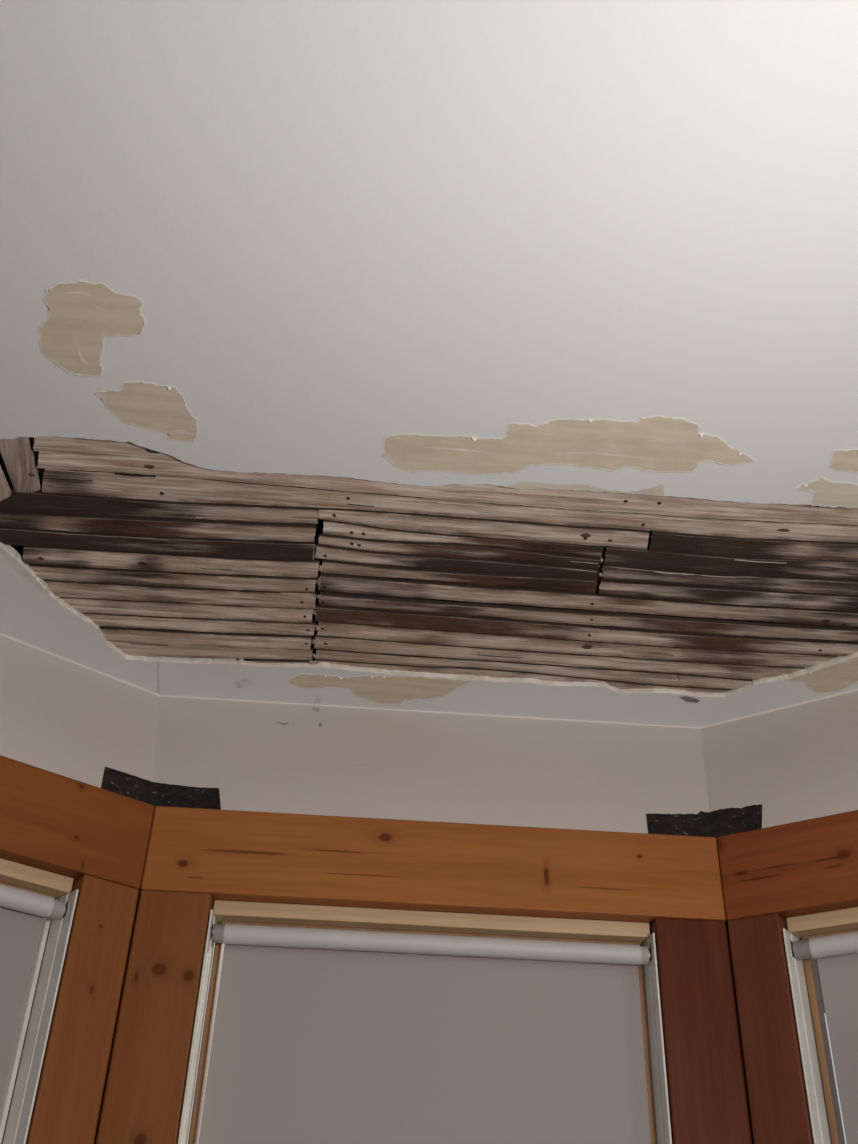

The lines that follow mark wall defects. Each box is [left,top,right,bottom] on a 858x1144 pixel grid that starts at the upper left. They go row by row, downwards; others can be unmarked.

spalling [0,279,858,705]